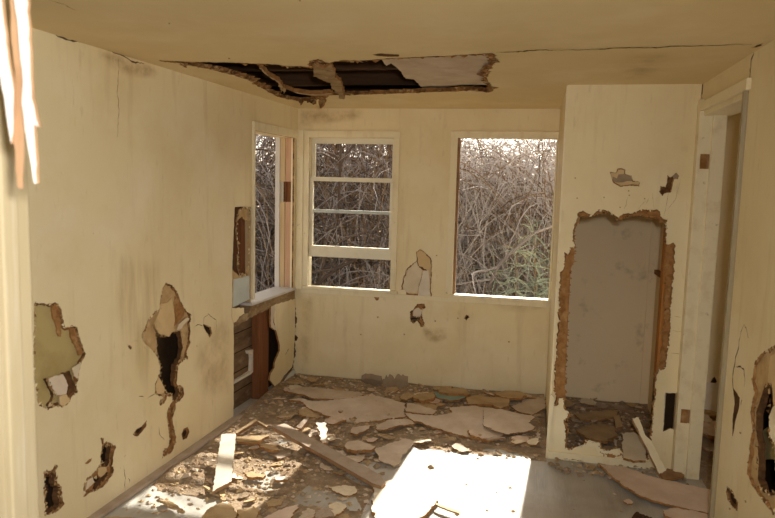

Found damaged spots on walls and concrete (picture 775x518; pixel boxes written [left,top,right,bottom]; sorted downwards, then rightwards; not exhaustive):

crack [113,52,144,136]
crack [583,43,763,78]
spalling [610,168,640,196]
hole [659,173,679,196]
spalling [235,207,251,277]
flaking render [401,250,437,327]
spalling [33,302,86,410]
hole [139,283,217,458]
spalling [83,438,116,497]
peeling [565,440,622,457]
spalling [732,388,741,436]
spalling [746,345,775,515]